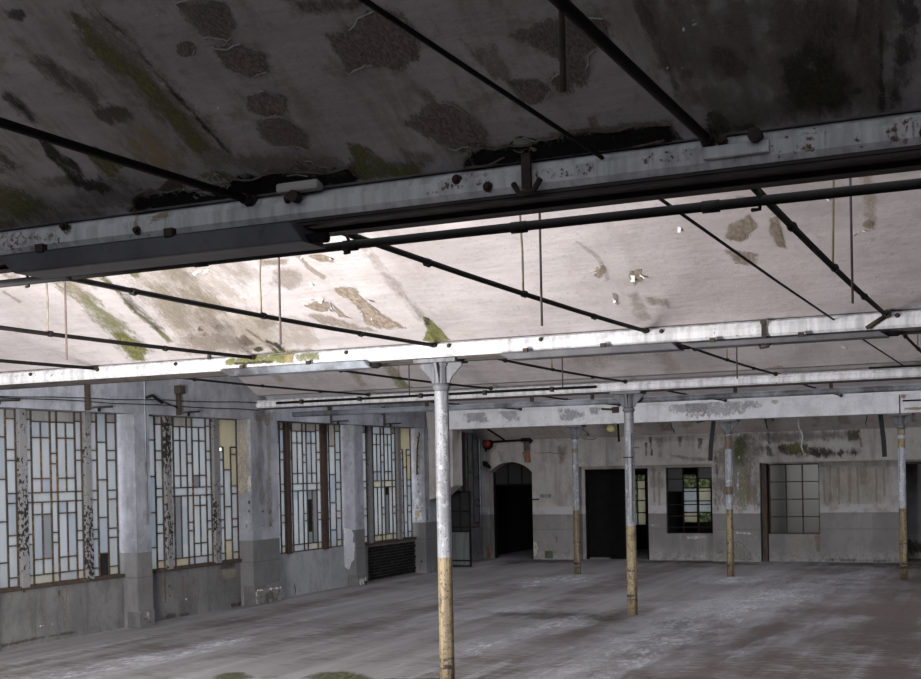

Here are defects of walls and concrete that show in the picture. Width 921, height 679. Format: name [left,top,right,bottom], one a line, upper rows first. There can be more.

spalling [175,0,269,78]
spalling [324,10,420,74]
spalling [476,16,597,105]
damp [635,0,920,136]
mould [2,92,35,123]
mould [39,140,113,195]
flaking render [127,90,361,213]
rust [886,118,921,143]
damp [655,421,693,443]
damp [712,416,865,509]
peeling [343,528,355,569]
spalling [359,541,422,585]